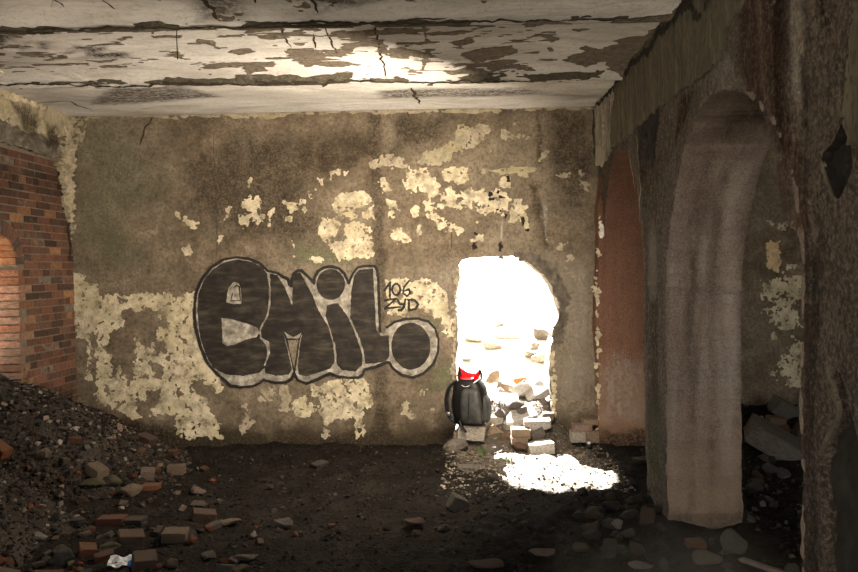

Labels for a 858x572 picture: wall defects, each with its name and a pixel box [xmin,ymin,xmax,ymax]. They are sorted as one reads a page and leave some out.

peeling [73,272,224,440]
peeling [318,190,376,262]
peeling [0,0,745,250]
peeling [745,91,782,138]
peeling [760,170,806,434]
peeling [817,2,858,204]